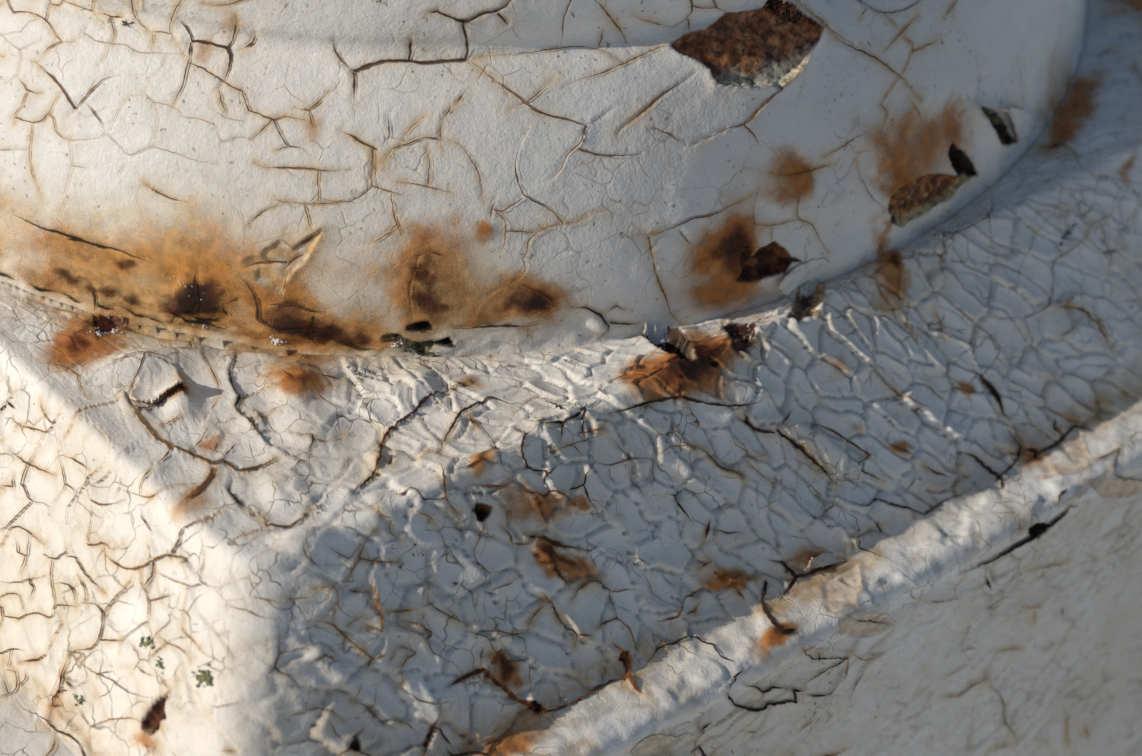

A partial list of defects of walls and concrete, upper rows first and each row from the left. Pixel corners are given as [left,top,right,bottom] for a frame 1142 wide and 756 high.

peeling [672,0,873,89]
crack [644,0,957,336]
rust [874,106,962,199]
rust [477,221,492,240]
rust [689,213,759,309]
rust [24,225,566,397]
crack [0,0,874,756]
rust [619,331,739,402]
crack [395,359,1095,592]
crack [1092,448,1140,481]
crack [922,487,1086,651]
peeling [141,694,167,735]